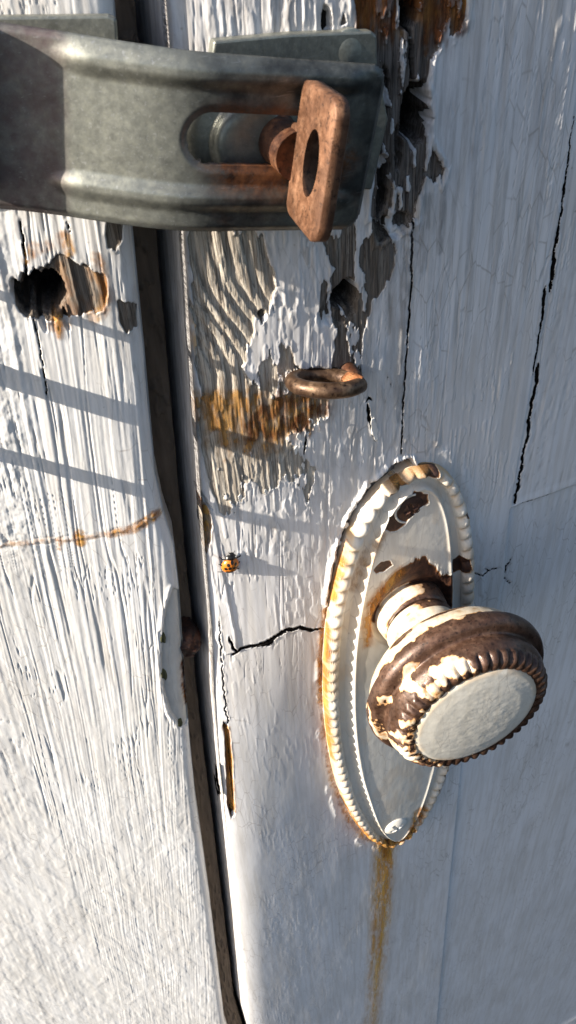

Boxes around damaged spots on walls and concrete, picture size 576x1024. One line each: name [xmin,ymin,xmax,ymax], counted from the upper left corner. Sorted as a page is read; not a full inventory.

rust [112,512,161,534]
peeling [187,231,328,516]
rust [194,390,329,453]
peeling [319,219,396,373]
crack [400,198,415,454]
crack [513,117,574,504]
crack [218,621,323,723]
rust [317,554,428,988]